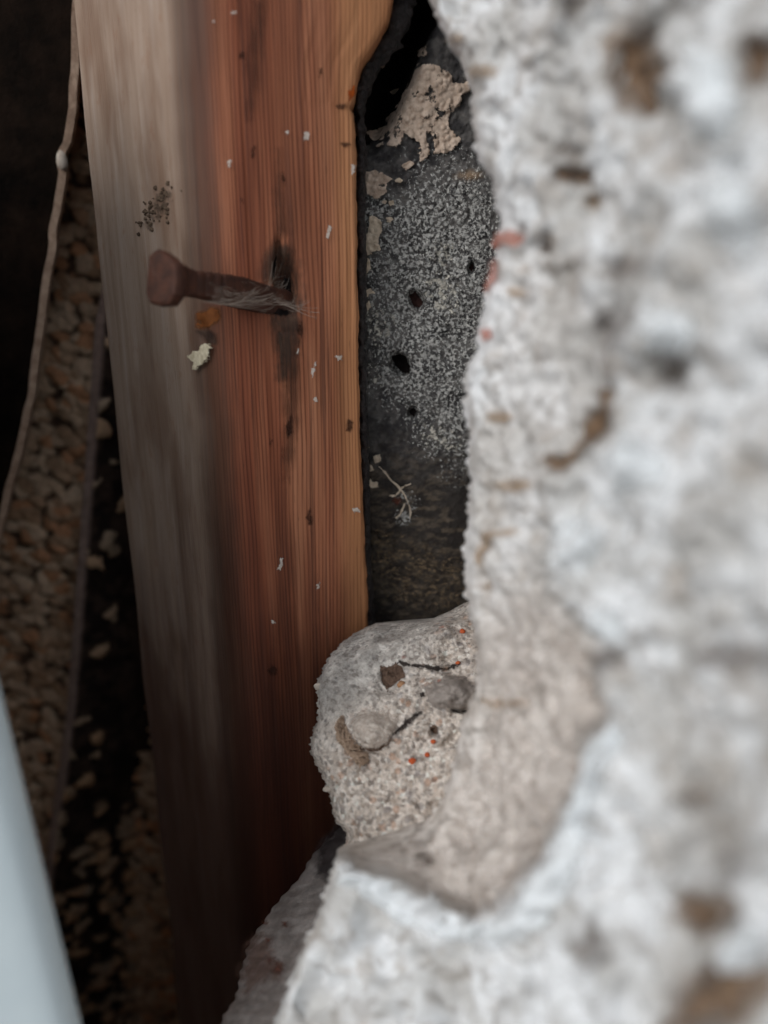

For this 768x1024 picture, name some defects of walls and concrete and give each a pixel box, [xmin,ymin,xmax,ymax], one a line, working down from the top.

peeling [366,46,471,273]
peeling [369,454,381,488]
crack [363,660,467,752]